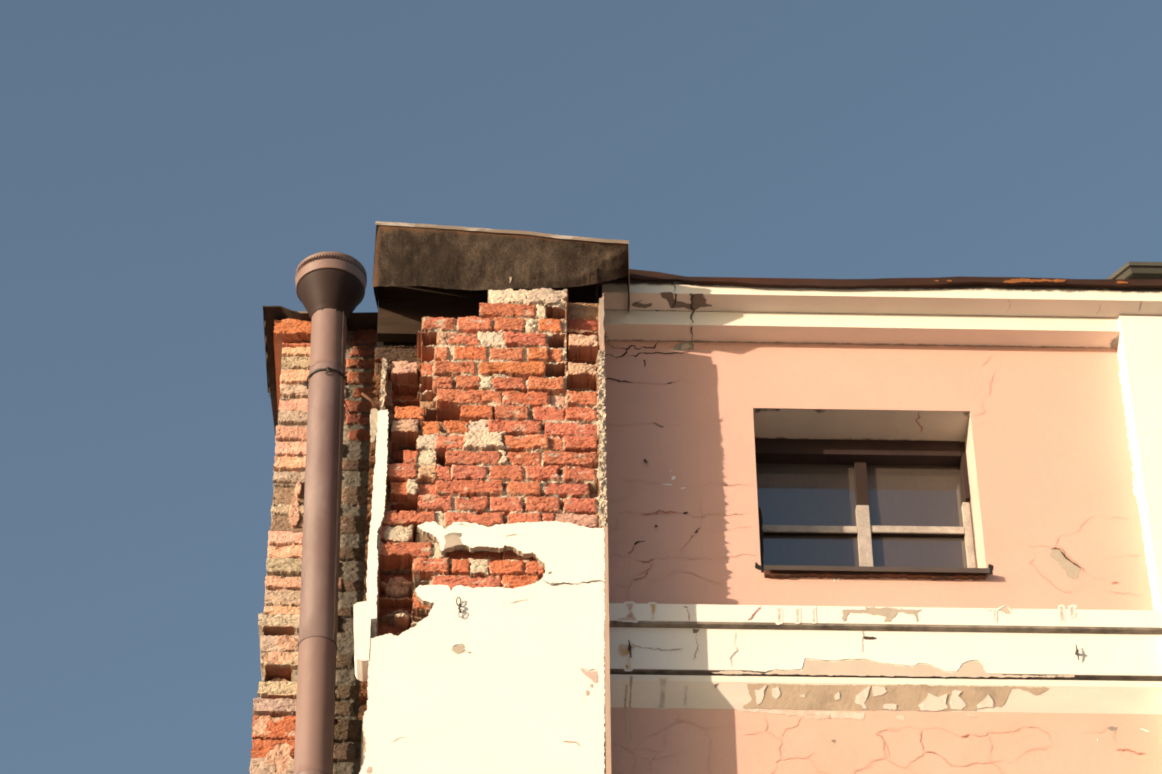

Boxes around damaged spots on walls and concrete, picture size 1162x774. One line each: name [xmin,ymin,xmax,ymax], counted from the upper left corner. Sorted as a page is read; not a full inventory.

peeling [632,292,712,311]
crack [605,282,701,385]
spalling [443,532,463,549]
crack [511,479,752,603]
spalling [1050,546,1086,579]
crack [1021,513,1143,595]
peeling [712,657,1075,720]
crack [853,726,1050,773]